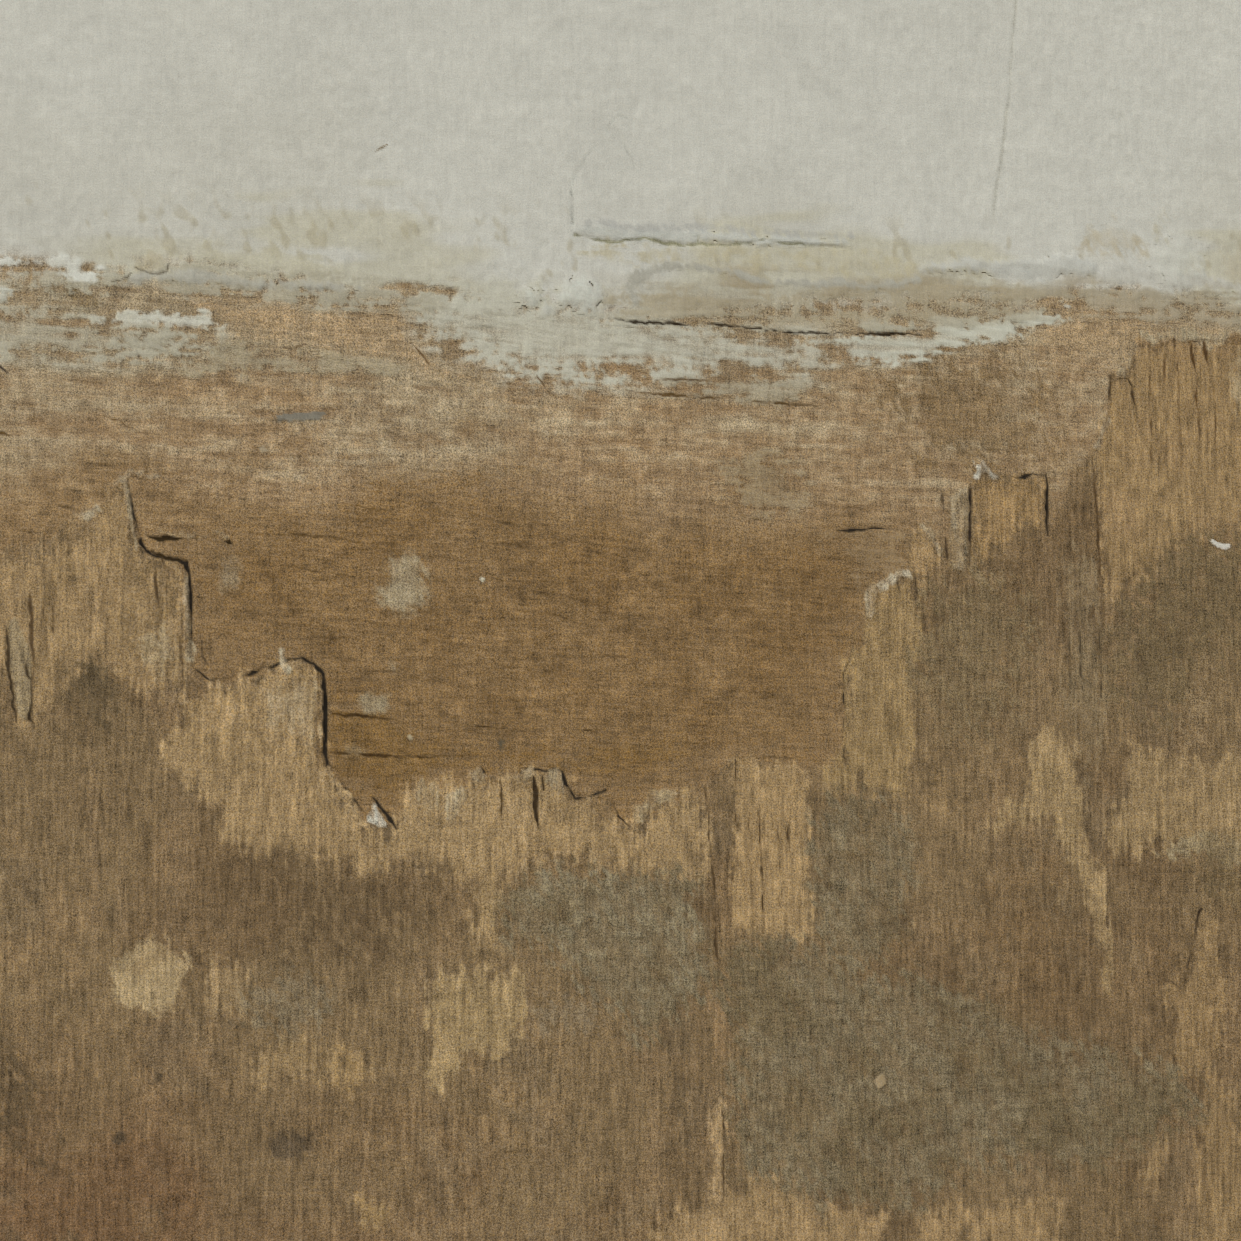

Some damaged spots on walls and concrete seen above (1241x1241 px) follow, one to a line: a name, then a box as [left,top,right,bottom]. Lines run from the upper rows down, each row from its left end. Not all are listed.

peeling [0,241,1241,831]
crack [572,231,853,251]